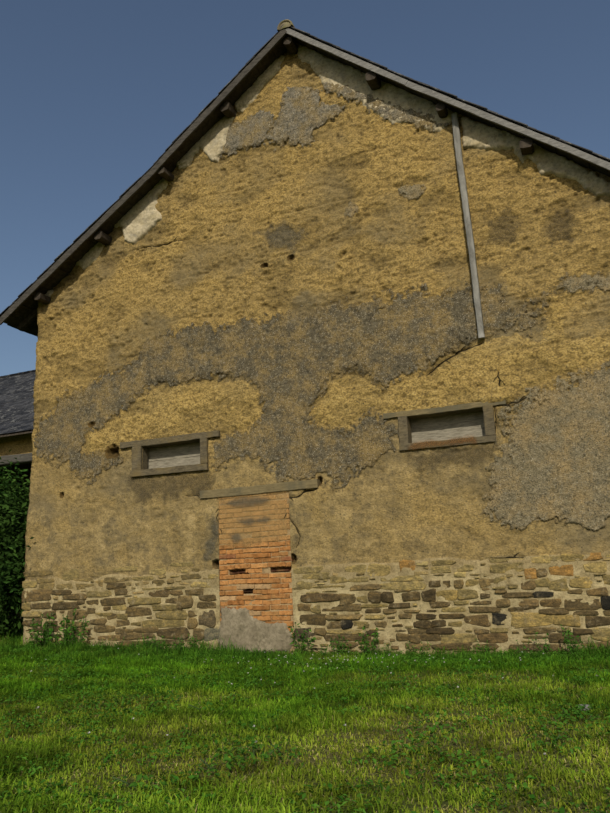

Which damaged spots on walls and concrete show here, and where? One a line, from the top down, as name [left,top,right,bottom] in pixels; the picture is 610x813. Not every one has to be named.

peeling [176,45,610,196]
peeling [114,178,168,244]
crack [426,343,482,376]
peeling [33,270,610,533]
crack [284,488,317,547]